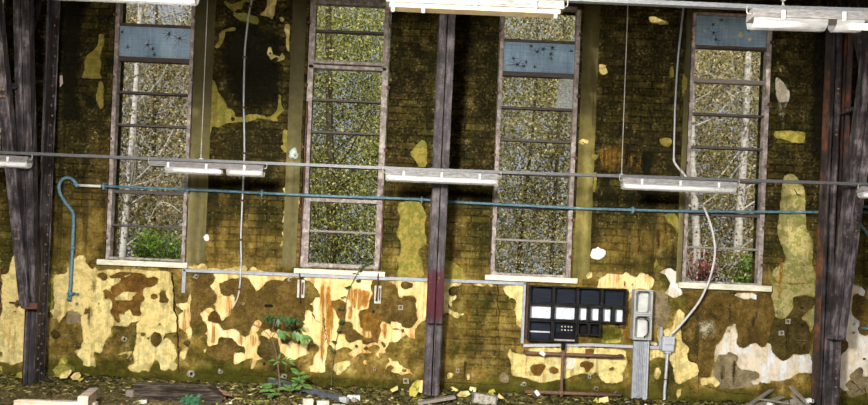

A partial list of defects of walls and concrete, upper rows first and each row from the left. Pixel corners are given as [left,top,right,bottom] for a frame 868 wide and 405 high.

peeling [215,0,290,61]
peeling [210,79,288,153]
peeling [0,256,25,373]
peeling [48,200,427,376]
peeling [508,328,627,384]
spalling [586,174,816,389]
peeling [840,284,868,397]